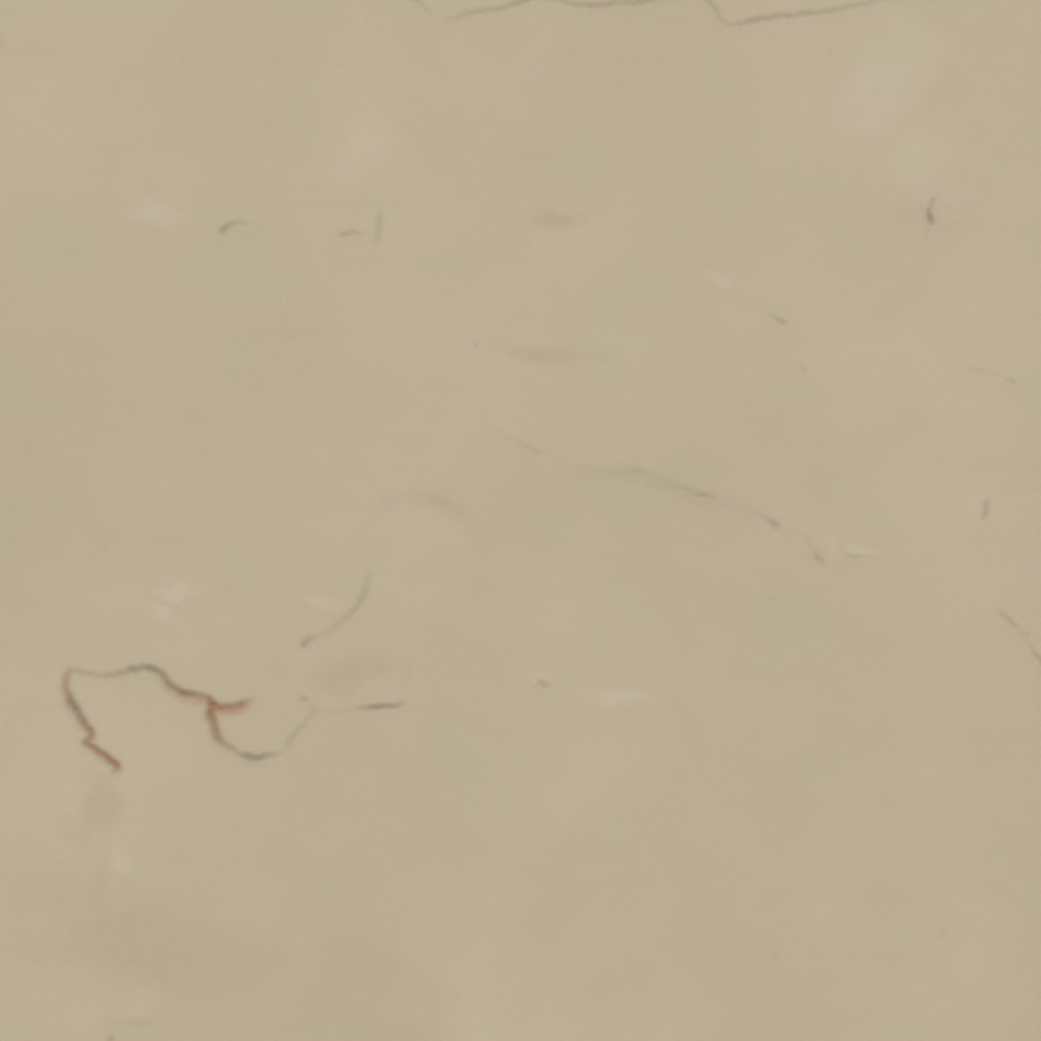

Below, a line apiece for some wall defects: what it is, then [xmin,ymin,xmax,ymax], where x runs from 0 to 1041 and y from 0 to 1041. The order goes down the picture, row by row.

crack [54,657,421,791]